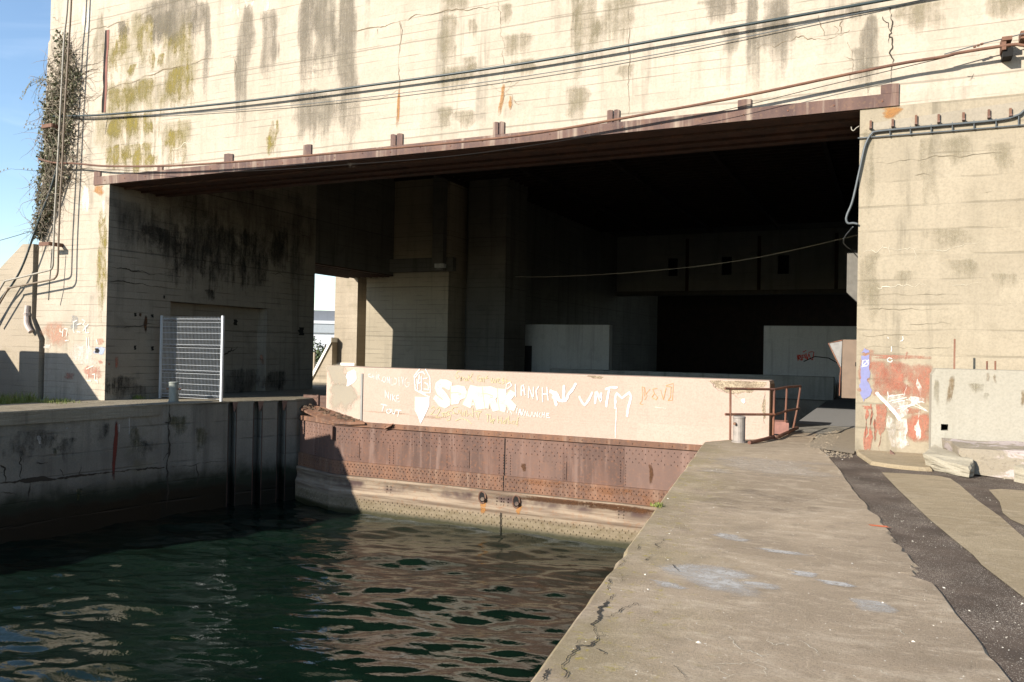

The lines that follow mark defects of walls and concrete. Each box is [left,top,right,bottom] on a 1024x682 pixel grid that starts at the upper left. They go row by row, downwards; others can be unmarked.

damp [106,0,210,173]
damp [231,1,279,96]
damp [298,0,356,131]
damp [727,0,792,58]
crack [882,8,894,83]
damp [123,203,312,298]
peeling [859,348,931,450]
crack [0,405,171,511]
rust [516,493,654,514]
crack [541,538,680,681]